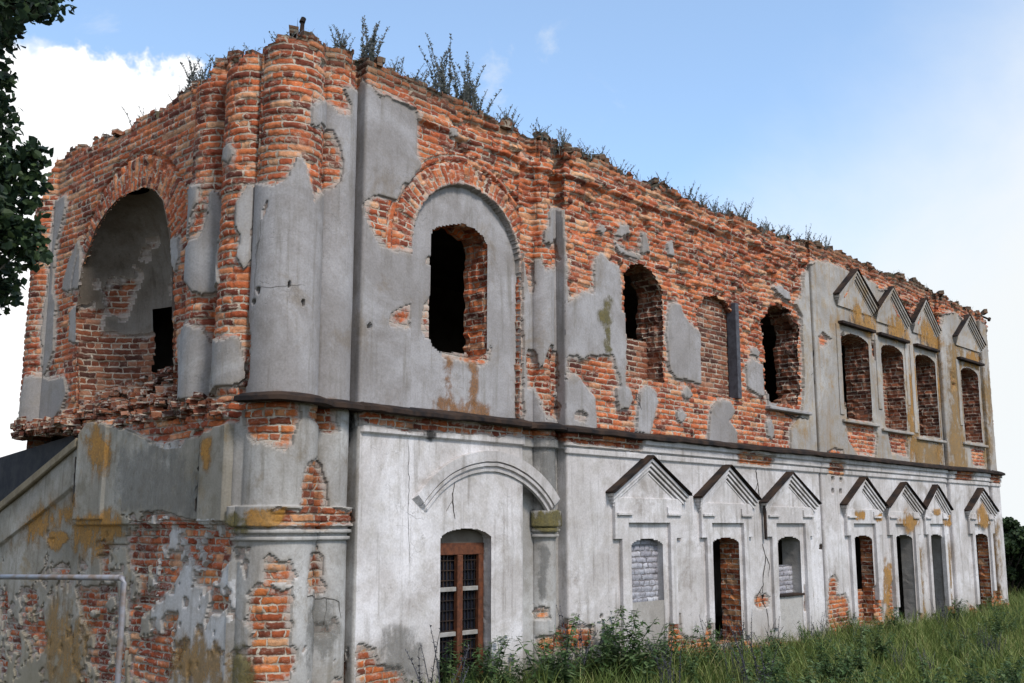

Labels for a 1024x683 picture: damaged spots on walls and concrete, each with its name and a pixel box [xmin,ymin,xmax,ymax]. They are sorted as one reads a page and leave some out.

peeling [18,25,659,452]
peeling [665,240,675,257]
peeling [771,285,791,301]
spalling [883,272,988,320]
peeling [665,303,702,423]
peeling [744,347,777,406]
peeling [706,399,774,467]
spalling [272,459,355,531]
spalling [0,585,55,680]
spalling [67,511,326,683]
crack [755,544,770,628]